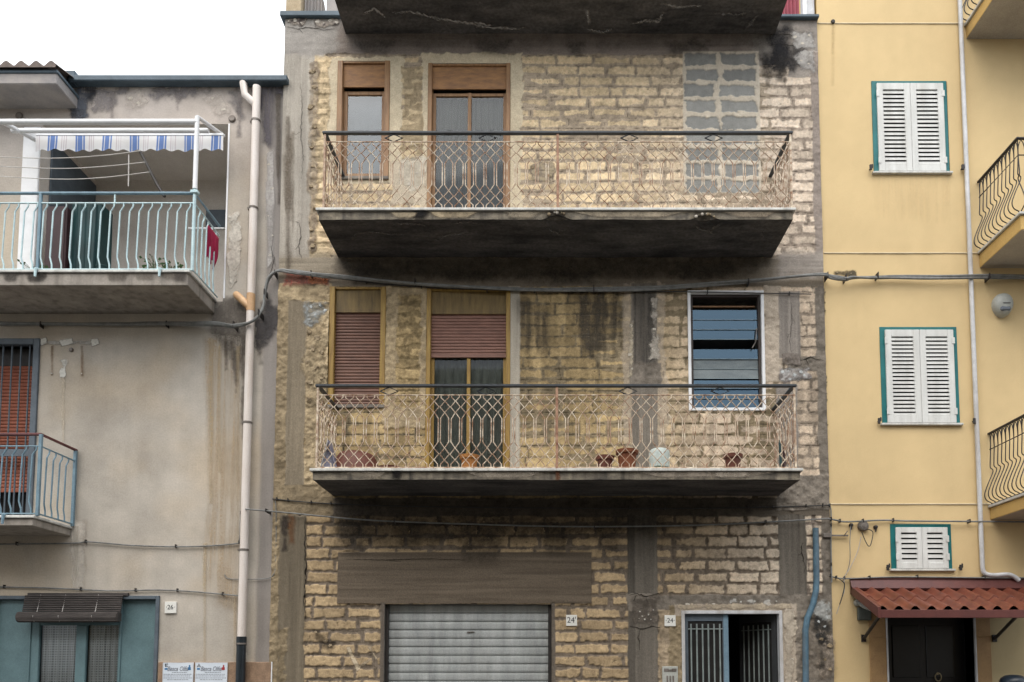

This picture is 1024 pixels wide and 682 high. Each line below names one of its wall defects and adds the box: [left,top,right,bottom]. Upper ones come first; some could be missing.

leakage [761,25,804,80]
leakage [579,292,619,355]
leakage [211,297,278,421]